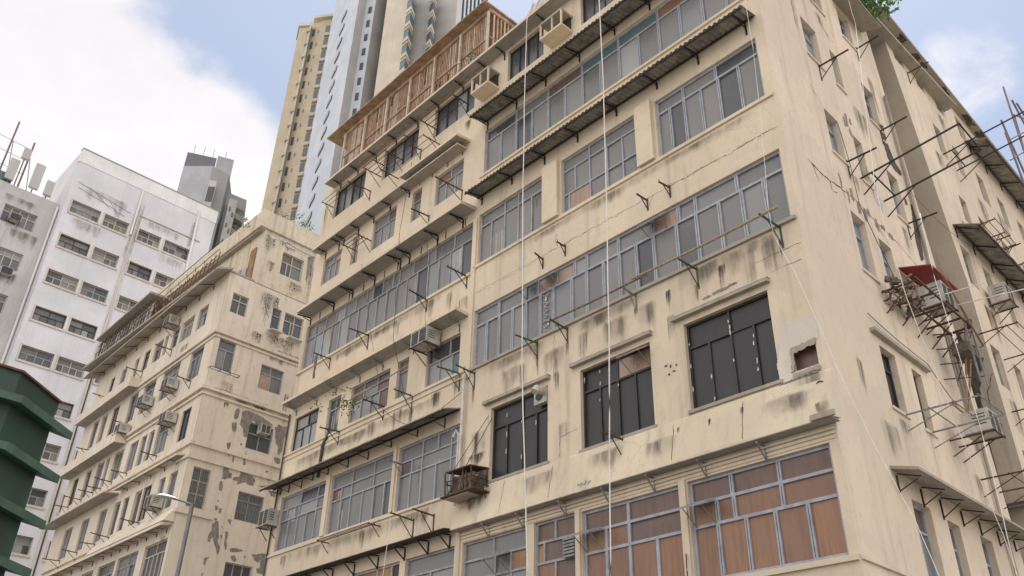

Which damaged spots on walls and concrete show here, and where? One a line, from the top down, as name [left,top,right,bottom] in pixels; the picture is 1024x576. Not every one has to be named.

crack [812,163,912,260]
spalling [778,337,821,387]
peeling [201,408,287,576]